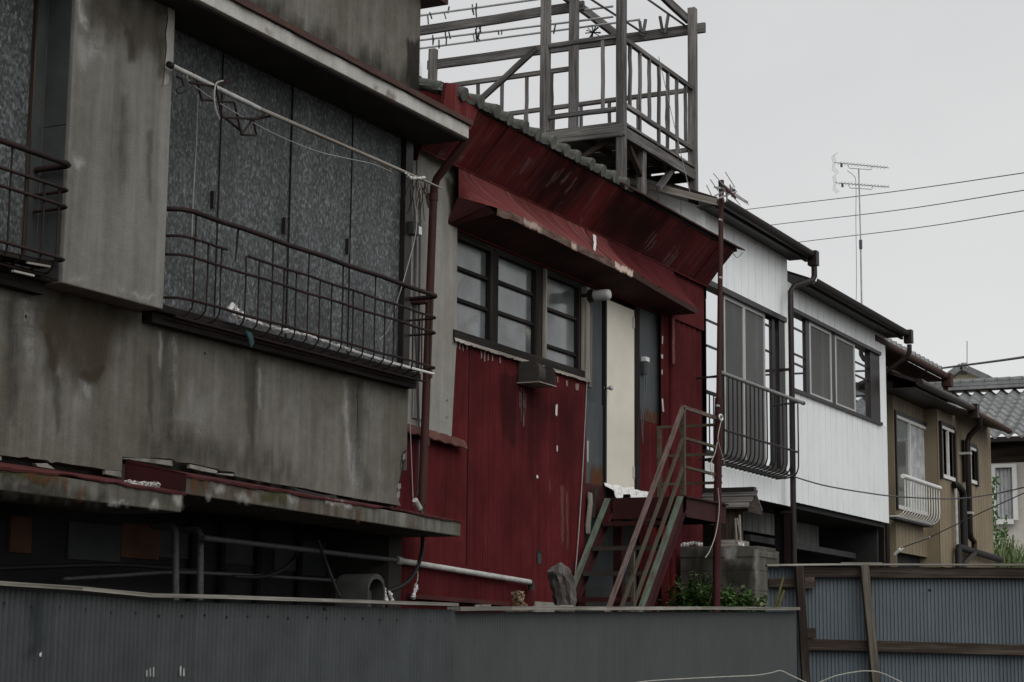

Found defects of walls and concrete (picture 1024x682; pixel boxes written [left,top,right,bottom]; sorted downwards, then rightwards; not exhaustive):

leakage [78,0,96,68]
peeling [615,261,633,277]
leakage [25,292,127,397]